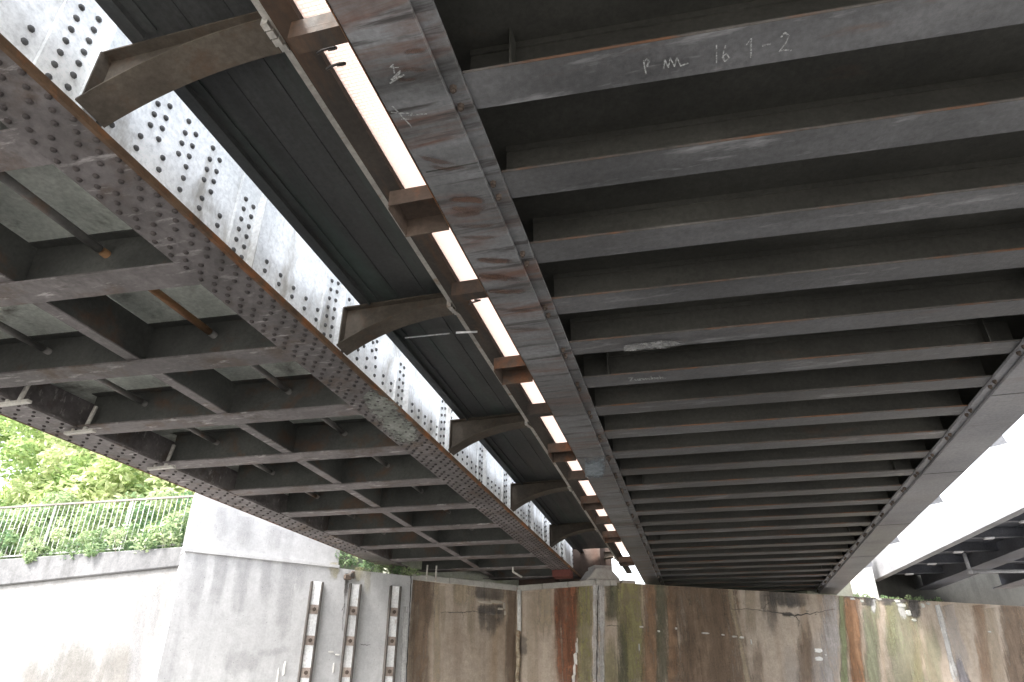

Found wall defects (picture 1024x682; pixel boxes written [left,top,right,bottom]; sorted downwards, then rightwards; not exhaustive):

corrosion [325,0,658,682]
water stain [454,584,515,682]
crack [732,602,833,626]
water stain [767,592,804,608]
corrosion [844,596,866,682]